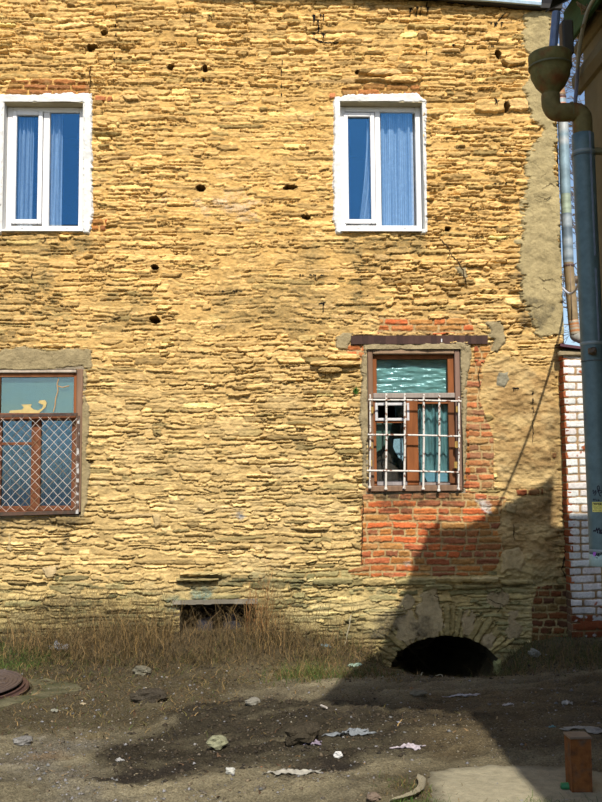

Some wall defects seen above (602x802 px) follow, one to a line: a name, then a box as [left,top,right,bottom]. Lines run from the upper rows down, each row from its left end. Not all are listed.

crack [439,238,467,286]
peeling [460,344,472,393]
flaking render [393,587,445,645]